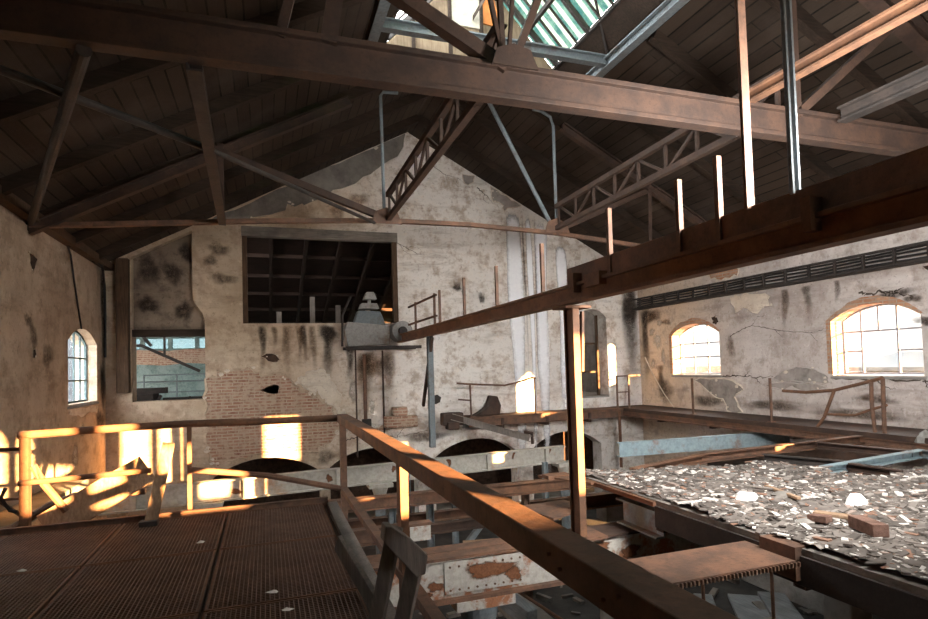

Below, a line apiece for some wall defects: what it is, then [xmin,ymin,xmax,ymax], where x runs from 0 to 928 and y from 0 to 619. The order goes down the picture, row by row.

leakage [140,254,180,284]
leakage [139,297,158,311]
leakage [176,302,191,319]
crack [730,316,822,341]
leakage [259,326,337,361]
leakage [623,295,670,398]
crack [722,371,773,383]
peeling [202,352,356,468]
leakage [831,410,891,419]
corrosion [467,561,522,580]
corrosion [427,582,444,597]